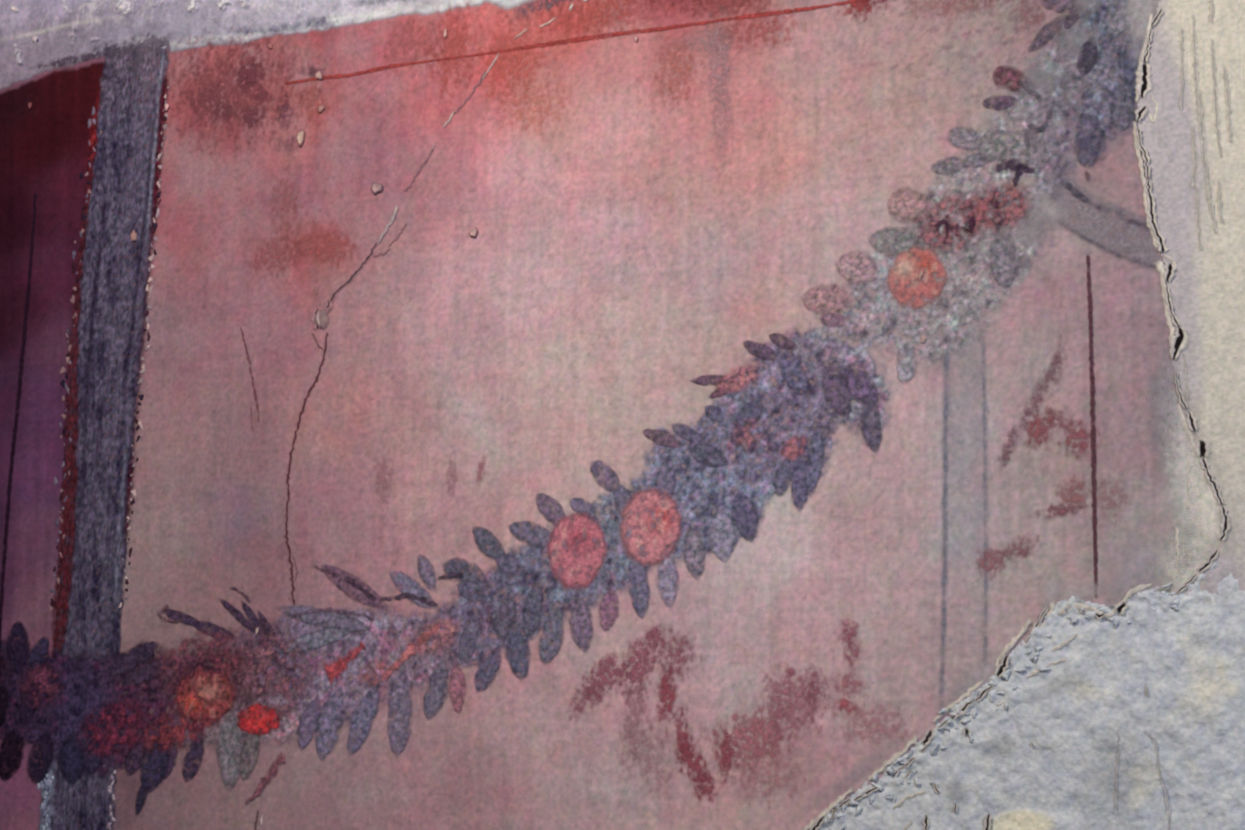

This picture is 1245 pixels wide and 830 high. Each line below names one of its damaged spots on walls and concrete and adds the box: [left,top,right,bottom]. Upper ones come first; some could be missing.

crack [284,0,587,626]
spalling [817,0,1245,830]